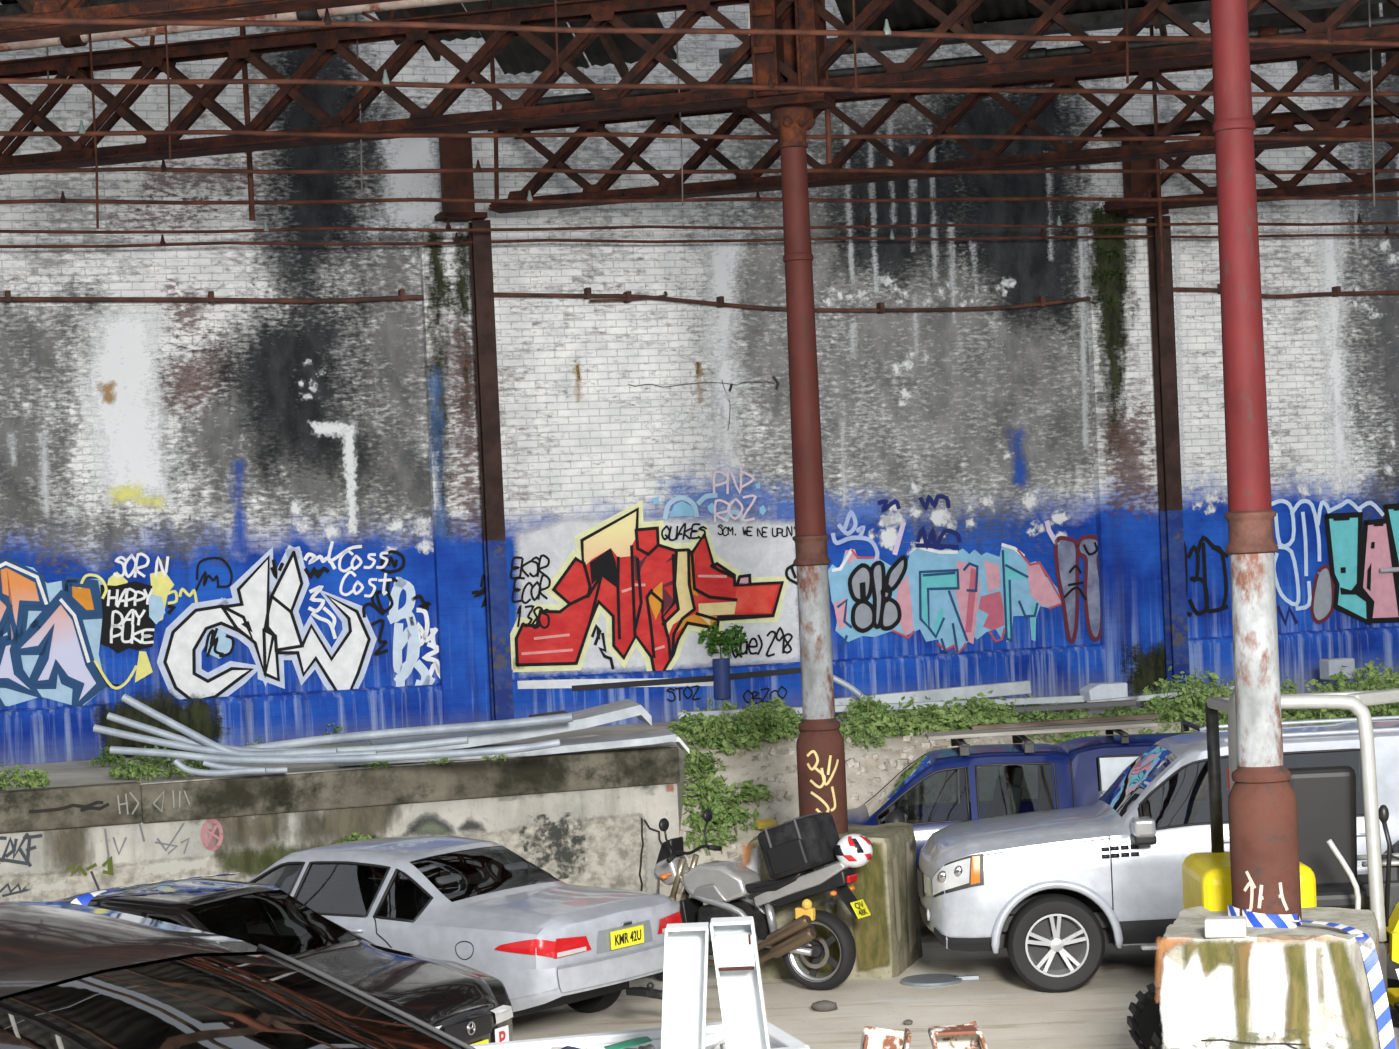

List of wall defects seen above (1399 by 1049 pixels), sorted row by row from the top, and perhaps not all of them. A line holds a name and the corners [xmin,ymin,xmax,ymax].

leakage [249,48,316,106]
leakage [268,44,367,130]
leakage [354,93,409,123]
leakage [1316,57,1399,125]
leakage [0,140,432,571]
leakage [688,118,794,508]
leakage [806,83,1094,539]
leakage [1331,142,1399,520]
leakage [1237,942,1252,997]
leakage [1350,940,1380,1049]